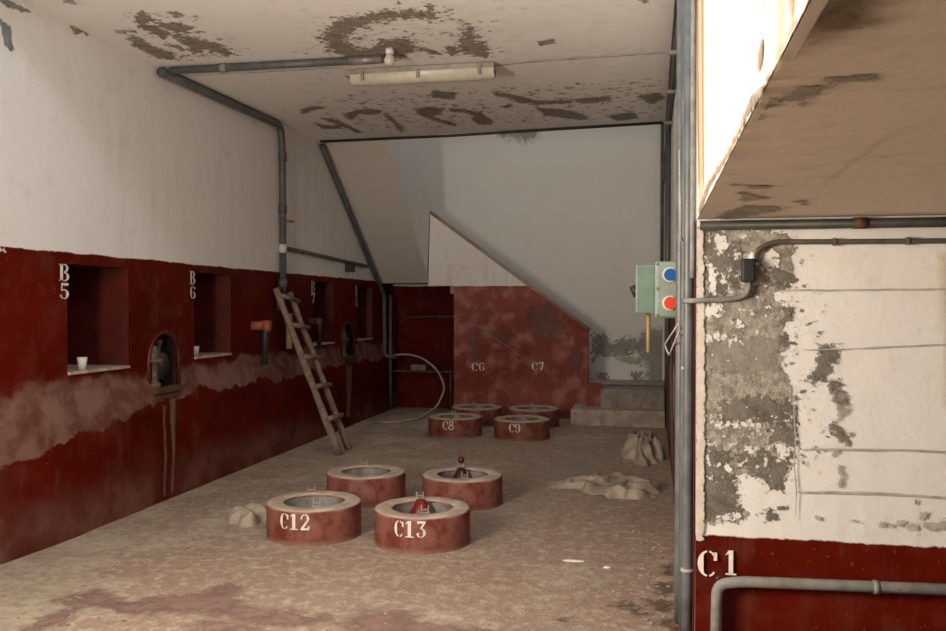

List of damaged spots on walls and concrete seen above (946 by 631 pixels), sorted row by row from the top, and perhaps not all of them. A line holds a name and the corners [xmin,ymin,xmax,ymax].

peeling [0,19,14,51]
peeling [0,0,30,13]
peeling [115,10,243,61]
peeling [315,1,508,61]
corrosion [777,0,793,45]
peeling [301,80,663,133]
peeling [698,19,877,213]
spalling [696,185,853,541]
peeling [877,500,946,536]